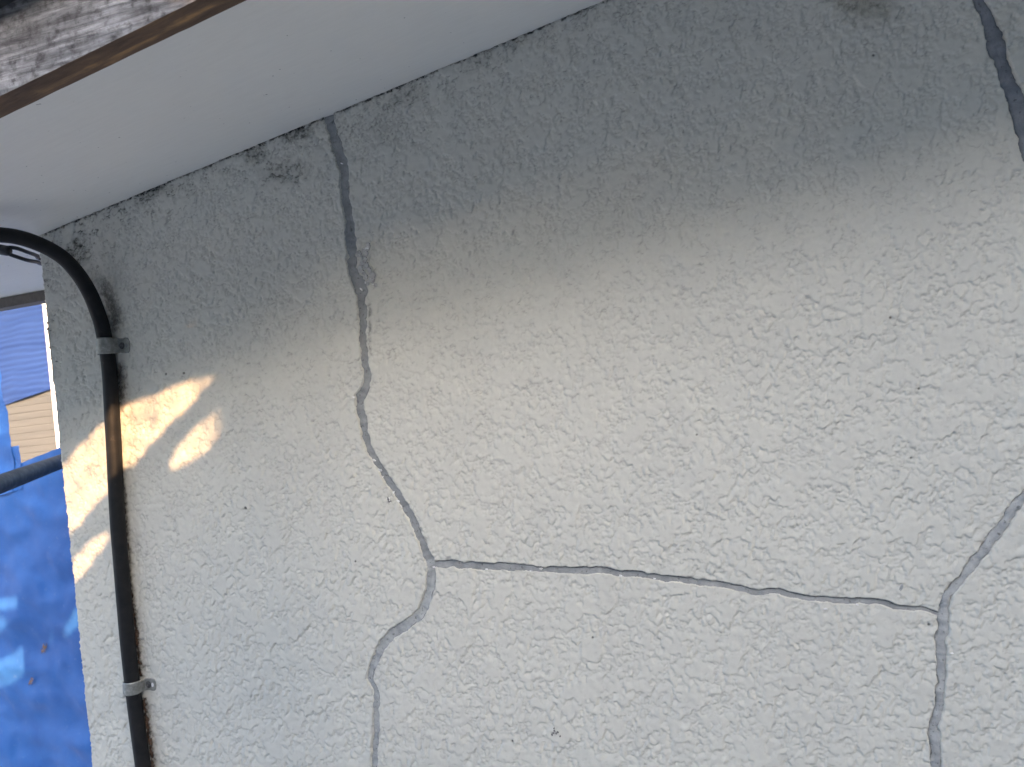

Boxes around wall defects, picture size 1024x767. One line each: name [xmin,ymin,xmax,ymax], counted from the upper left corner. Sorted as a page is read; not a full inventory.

crack [972,0,1024,161]
crack [324,115,1024,767]